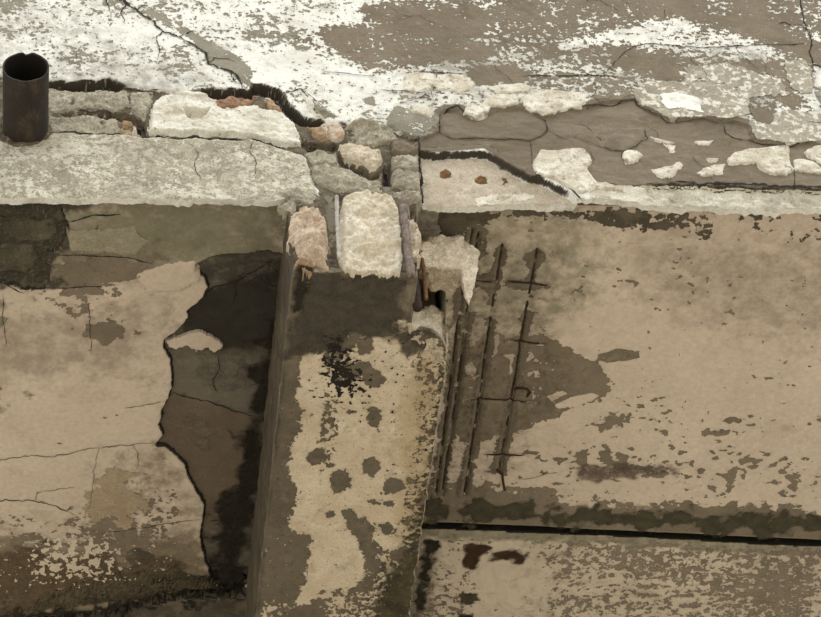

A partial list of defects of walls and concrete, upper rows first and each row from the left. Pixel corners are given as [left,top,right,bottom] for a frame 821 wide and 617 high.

peeling [0,121,316,346]
crack [106,0,331,112]
leakage [283,265,431,360]
crack [382,174,390,187]
peeling [0,0,821,194]
crack [417,136,425,203]
crack [323,0,820,178]
crack [0,443,149,517]
leakage [0,323,274,617]
spalling [0,250,282,617]
corrosion [462,543,528,570]
peeling [256,197,821,617]